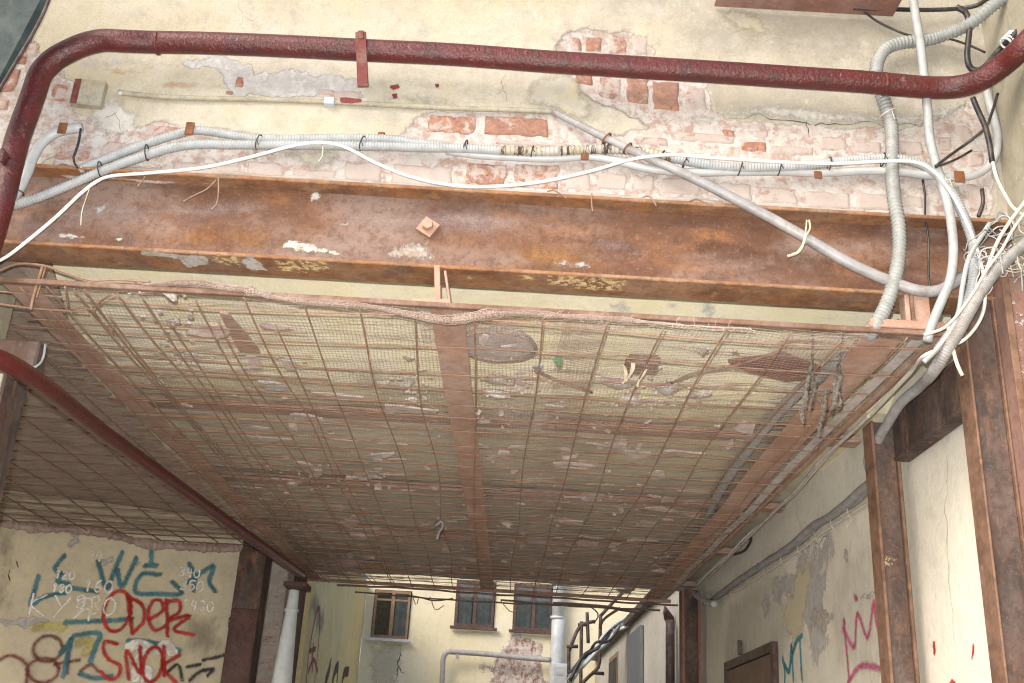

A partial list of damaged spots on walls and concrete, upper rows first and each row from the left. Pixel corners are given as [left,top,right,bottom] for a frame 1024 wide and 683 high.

spalling [0,42,41,149]
spalling [183,56,365,100]
spalling [25,72,889,213]
spalling [555,28,655,57]
spalling [895,104,994,218]
peeling [763,531,848,664]
spalling [479,633,549,683]